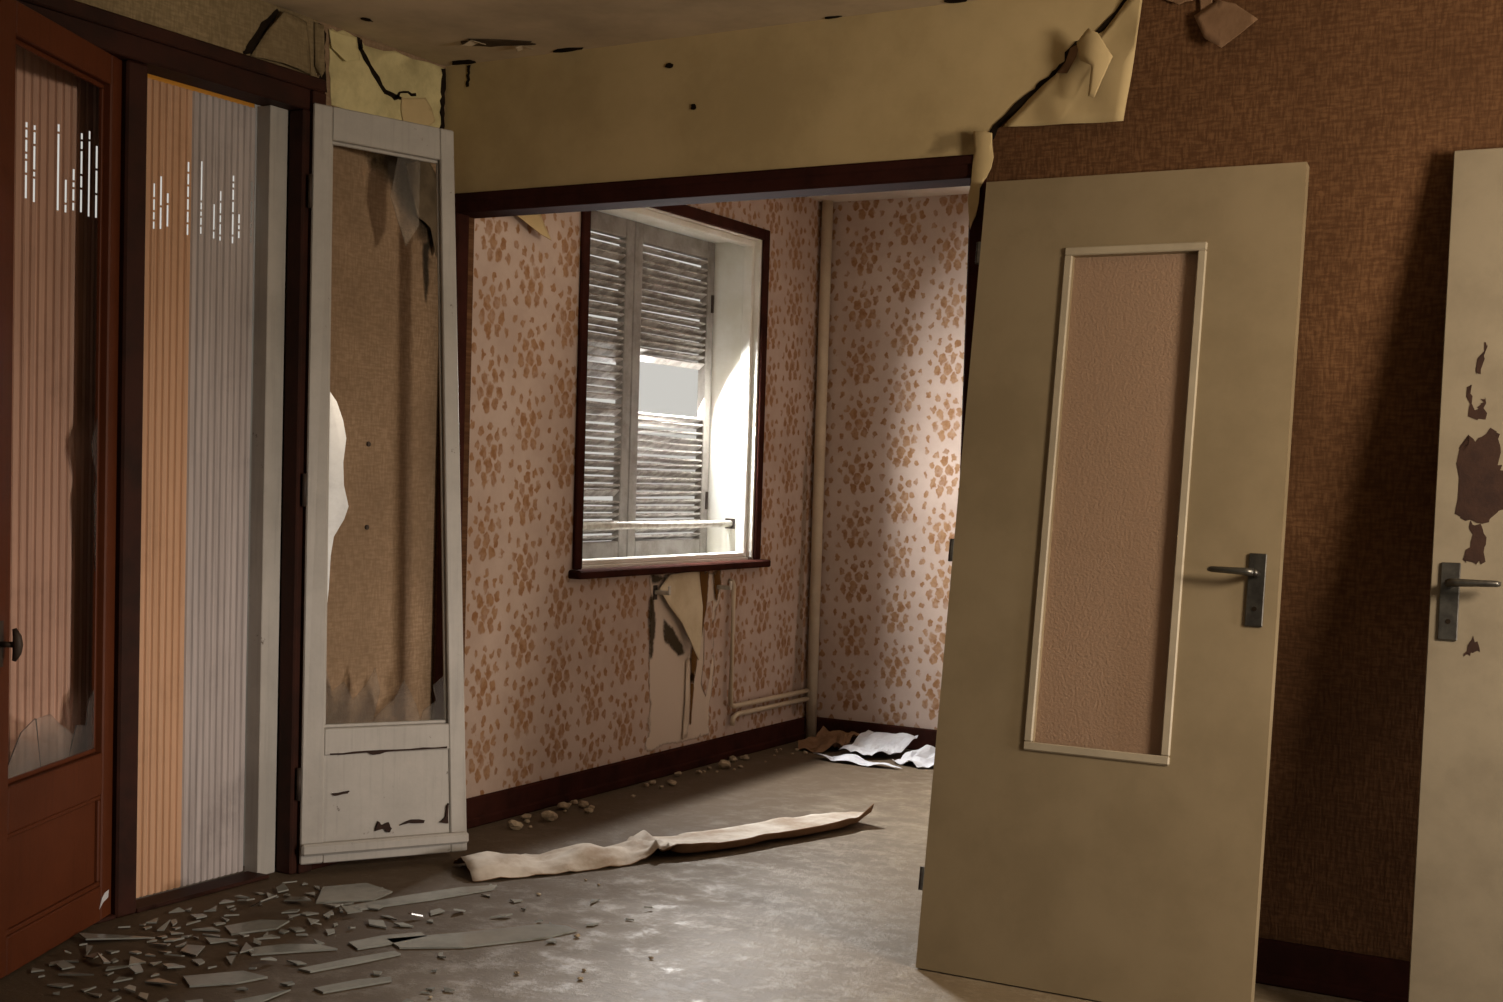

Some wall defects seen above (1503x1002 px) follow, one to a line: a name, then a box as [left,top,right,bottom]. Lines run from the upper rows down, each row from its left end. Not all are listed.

crack [357,37,471,129]
flaking render [645,574,720,751]